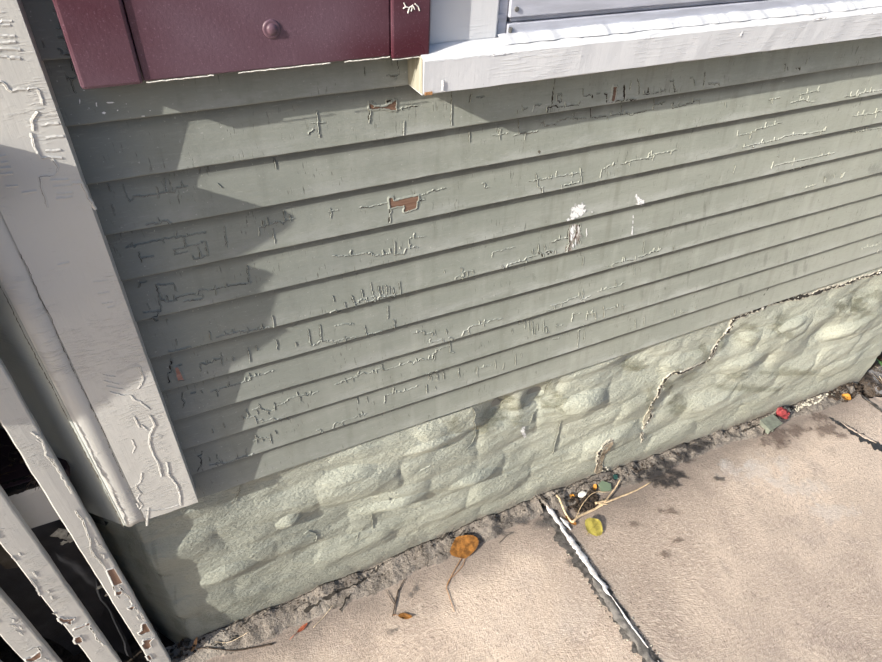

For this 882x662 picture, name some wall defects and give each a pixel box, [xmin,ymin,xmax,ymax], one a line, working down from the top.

crack [52,9,77,94]
peeling [367,98,418,123]
crack [0,80,252,321]
peeling [359,187,445,223]
peeling [565,223,583,252]
crack [640,242,882,443]
crack [661,423,766,453]
crack [514,438,630,506]
peeling [105,567,125,596]
peeling [52,612,105,646]
peeling [137,622,155,661]